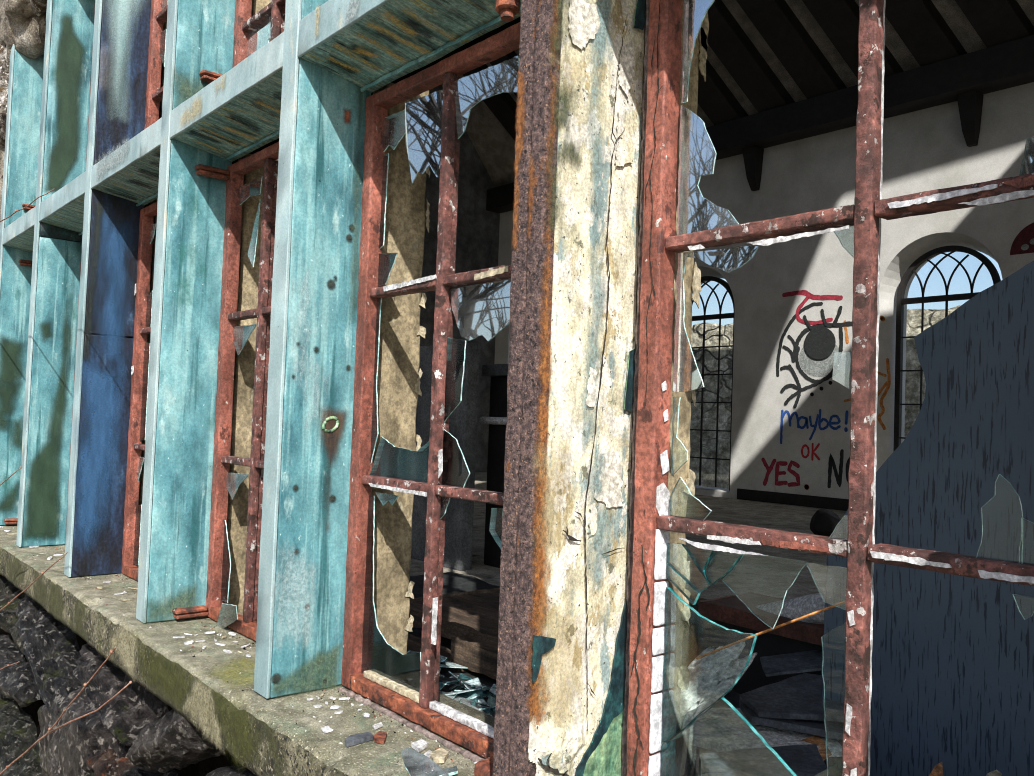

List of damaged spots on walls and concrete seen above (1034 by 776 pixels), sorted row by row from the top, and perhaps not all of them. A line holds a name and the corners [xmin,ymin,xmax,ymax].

peeling [568,0,600,50]
rust [513,72,534,247]
peeling [614,39,635,167]
crack [645,3,662,406]
rust [533,217,552,637]
crack [563,26,650,776]
damp [271,647,338,693]
rust [528,656,549,725]
spalling [535,764,560,776]